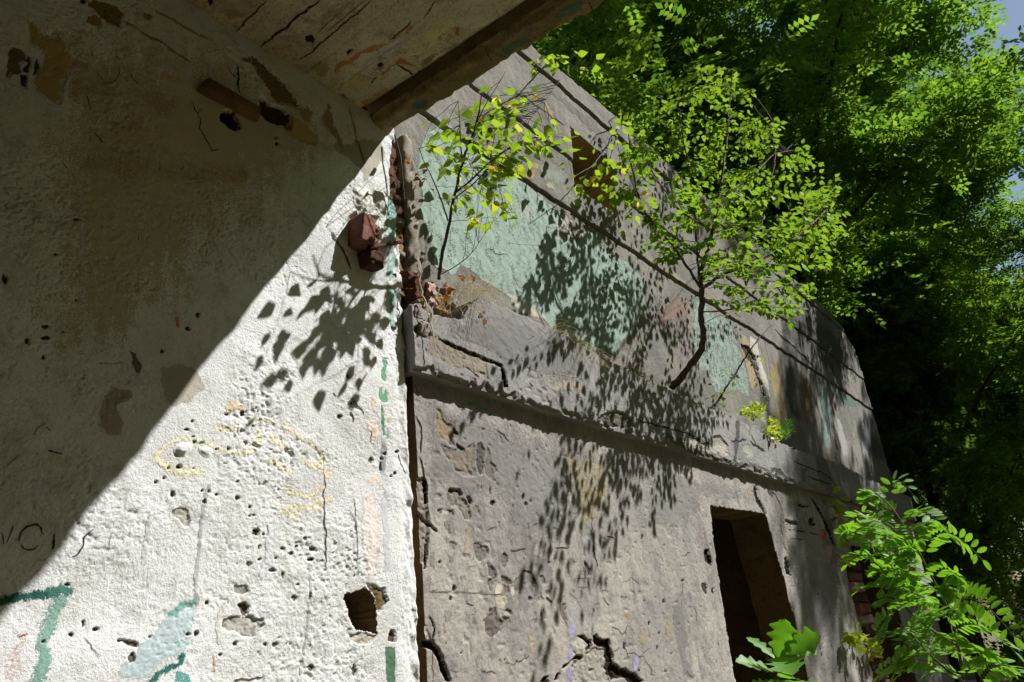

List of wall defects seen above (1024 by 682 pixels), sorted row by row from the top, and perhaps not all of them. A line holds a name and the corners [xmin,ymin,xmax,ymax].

crack [236,1,266,31]
crack [261,0,370,60]
peeling [5,23,85,102]
peeling [243,56,317,146]
crack [441,340,533,388]
crack [397,383,654,682]
spalling [221,584,277,647]